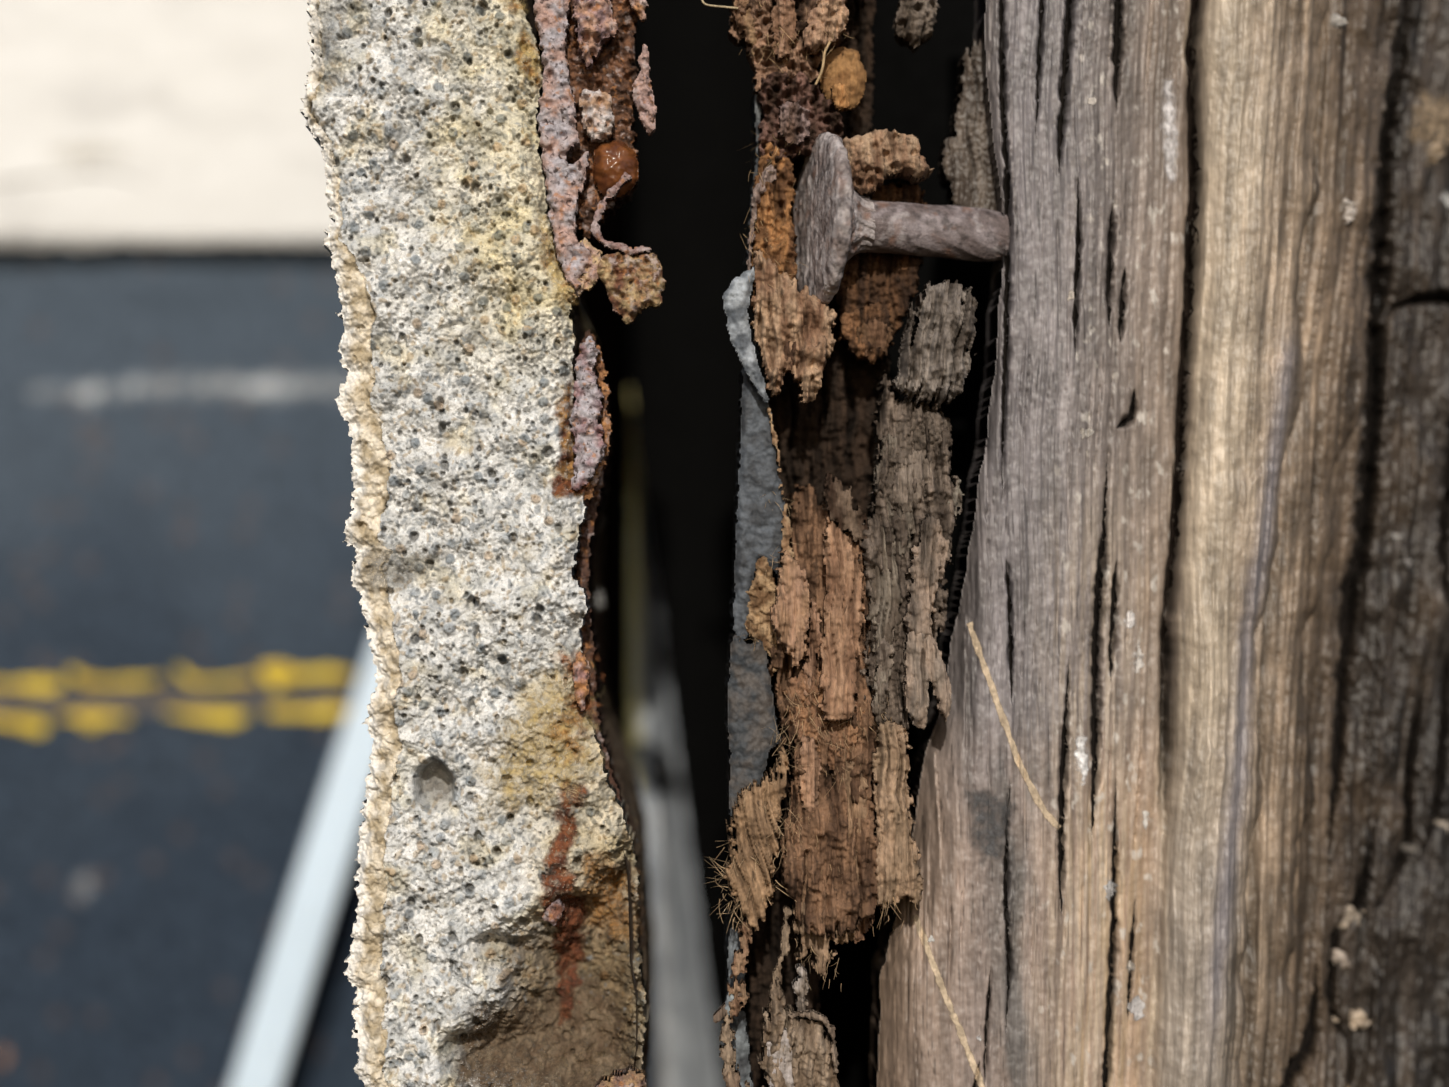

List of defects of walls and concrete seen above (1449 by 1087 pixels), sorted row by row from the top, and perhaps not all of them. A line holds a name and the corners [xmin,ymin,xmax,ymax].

rust [579,89,615,143]
rust [632,44,657,136]
peeling [732,0,849,296]
rust [552,336,612,500]
rust [542,228,666,325]
peeling [833,252,923,365]
crack [1160,0,1202,770]
crack [1281,0,1449,1087]
peeling [770,405,964,1011]
crack [1006,566,1014,706]
crack [1058,389,1136,1087]
peeling [719,912,752,1087]